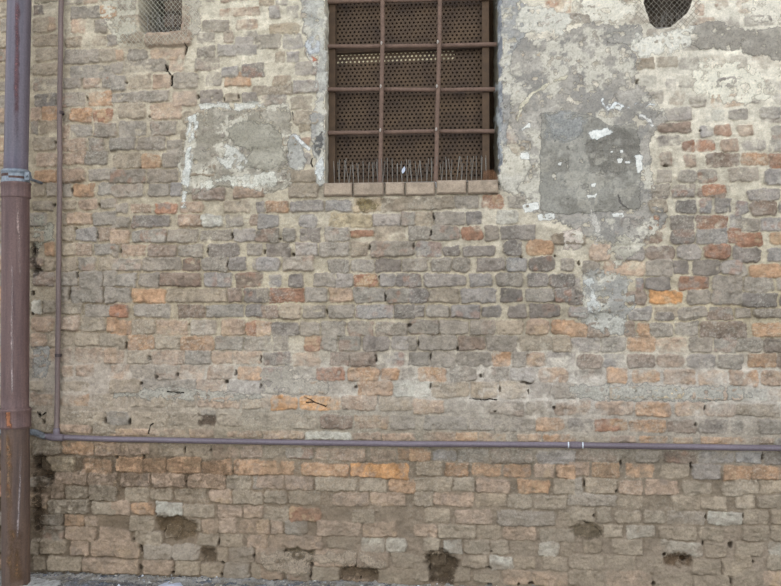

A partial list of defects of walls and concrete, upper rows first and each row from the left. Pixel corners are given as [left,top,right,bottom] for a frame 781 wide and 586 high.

spalling [156,515,197,540]
spalling [425,551,458,584]